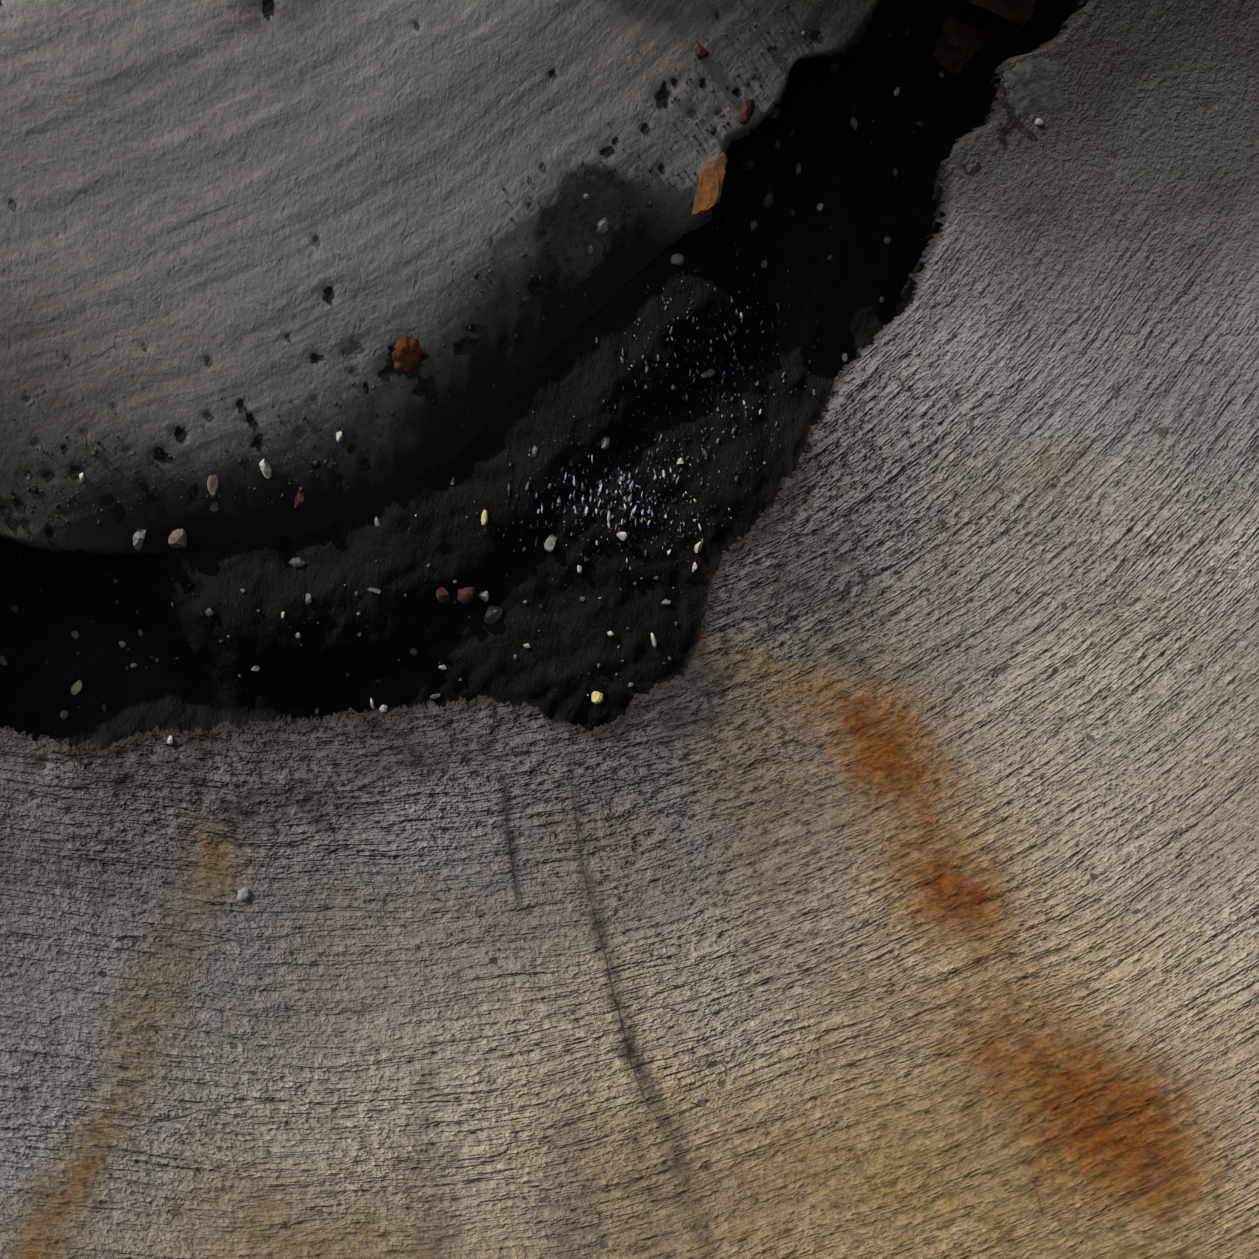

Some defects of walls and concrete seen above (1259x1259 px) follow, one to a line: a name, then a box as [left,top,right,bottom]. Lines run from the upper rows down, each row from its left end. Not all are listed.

spalling [261,0,274,21]
spalling [654,78,678,109]
spalling [993,57,1065,149]
spalling [527,136,633,280]
spalling [322,286,333,304]
spalling [341,336,438,399]
spalling [153,426,186,463]
spalling [236,399,263,452]
corrosion [839,696,921,789]
corrosion [907,822,993,927]
crack [570,764,722,1163]
corrosion [986,1048,1184,1196]